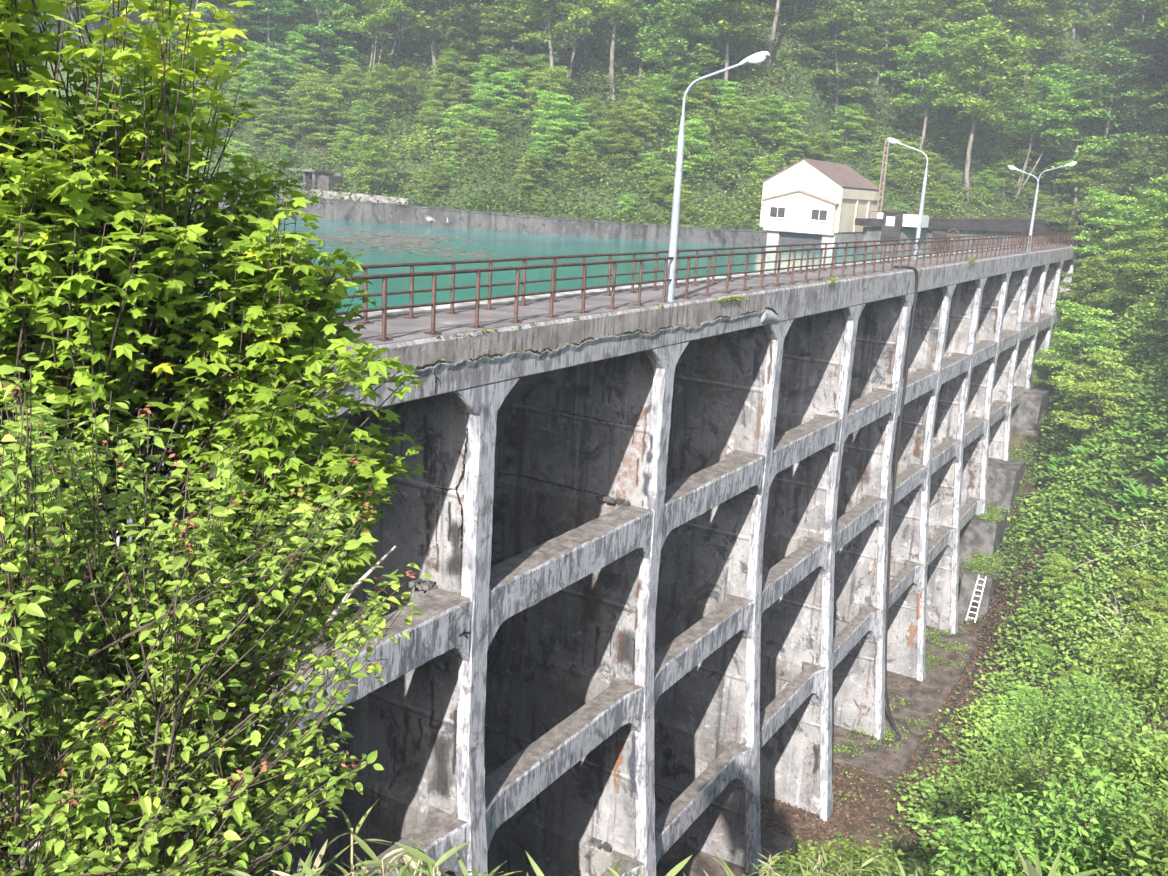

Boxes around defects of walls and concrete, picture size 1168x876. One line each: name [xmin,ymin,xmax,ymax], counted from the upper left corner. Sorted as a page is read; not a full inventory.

rust [425,503,439,571]
crack [435,428,468,559]
water stain [428,681,457,797]
rust [613,742,623,793]